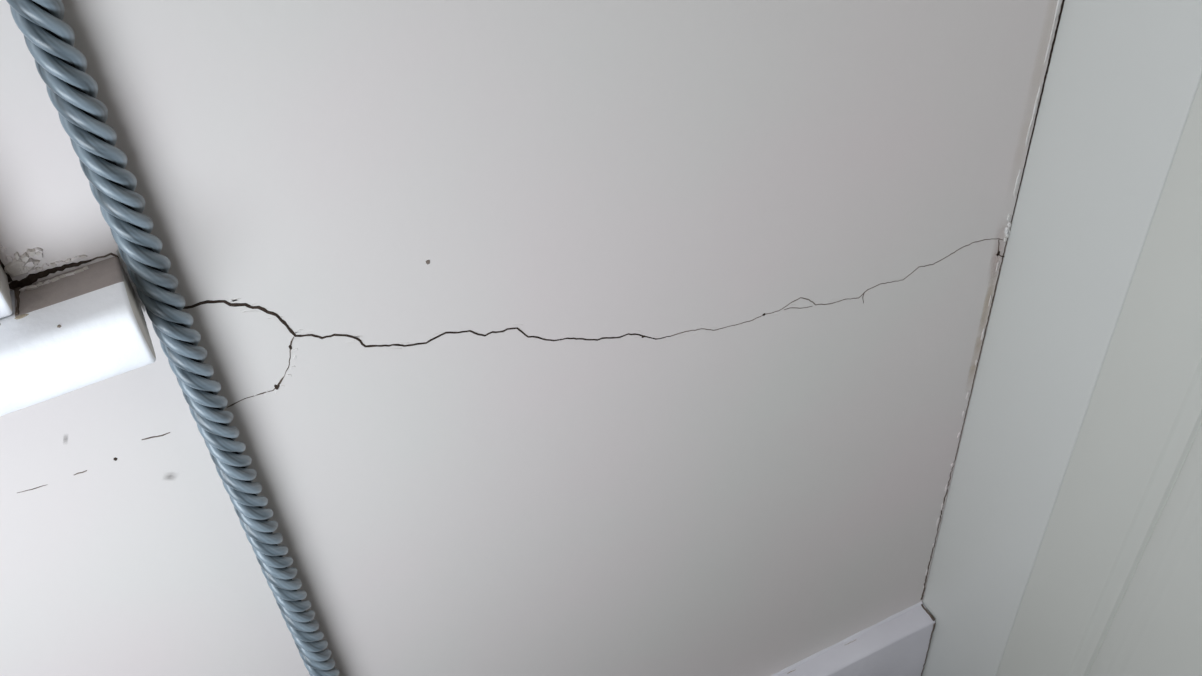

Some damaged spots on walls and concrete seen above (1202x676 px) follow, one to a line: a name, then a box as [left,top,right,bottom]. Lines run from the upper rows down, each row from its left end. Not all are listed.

crack [0,245,119,315]
crack [183,0,1065,676]